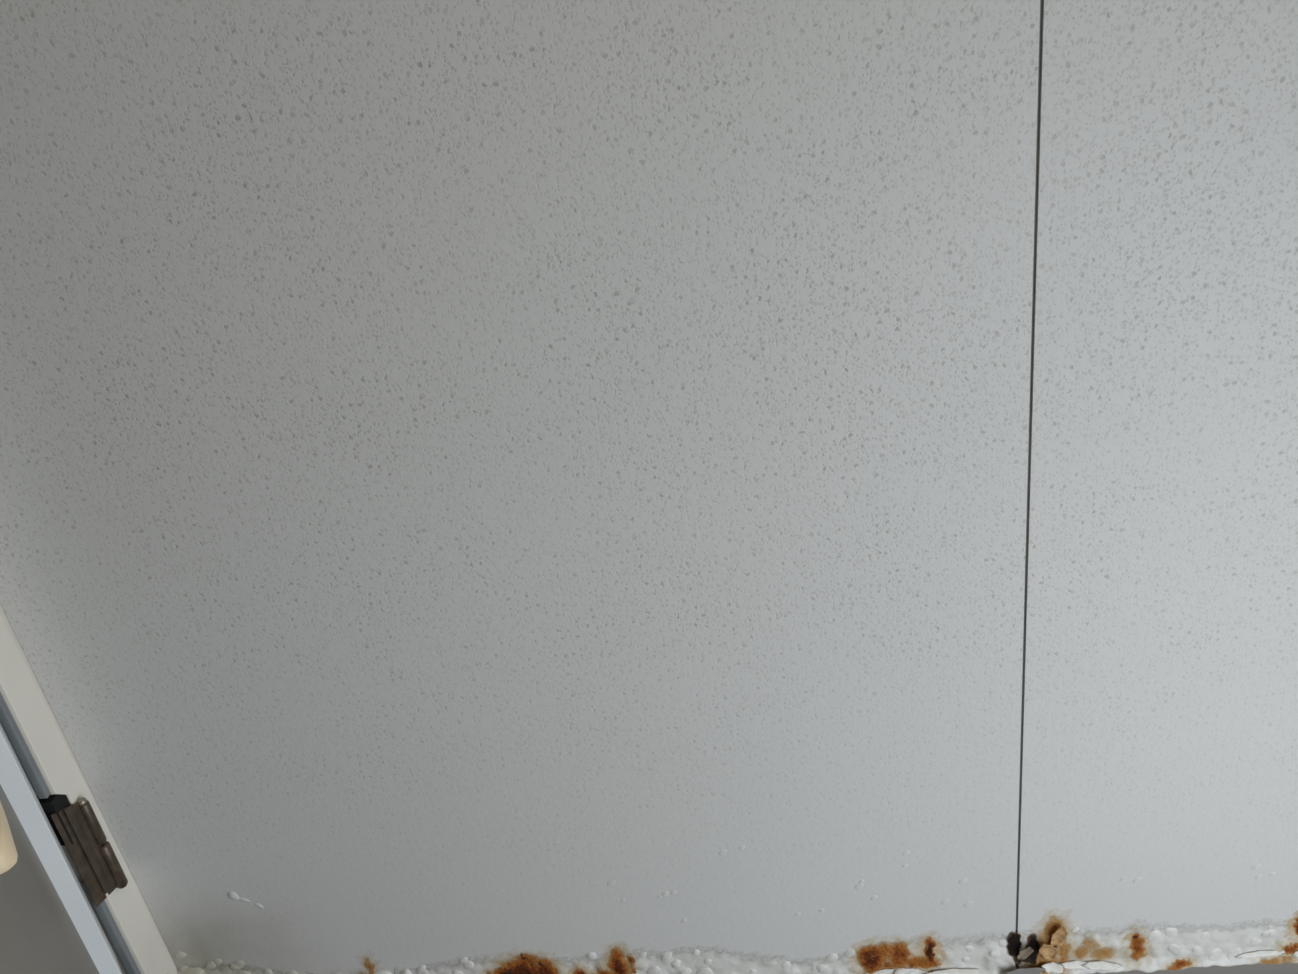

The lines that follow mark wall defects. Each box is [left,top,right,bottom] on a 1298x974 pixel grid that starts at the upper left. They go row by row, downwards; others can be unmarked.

corrosion [488,948,636,974]
corrosion [856,937,982,974]
corrosion [1026,917,1148,974]
corrosion [1235,915,1298,965]